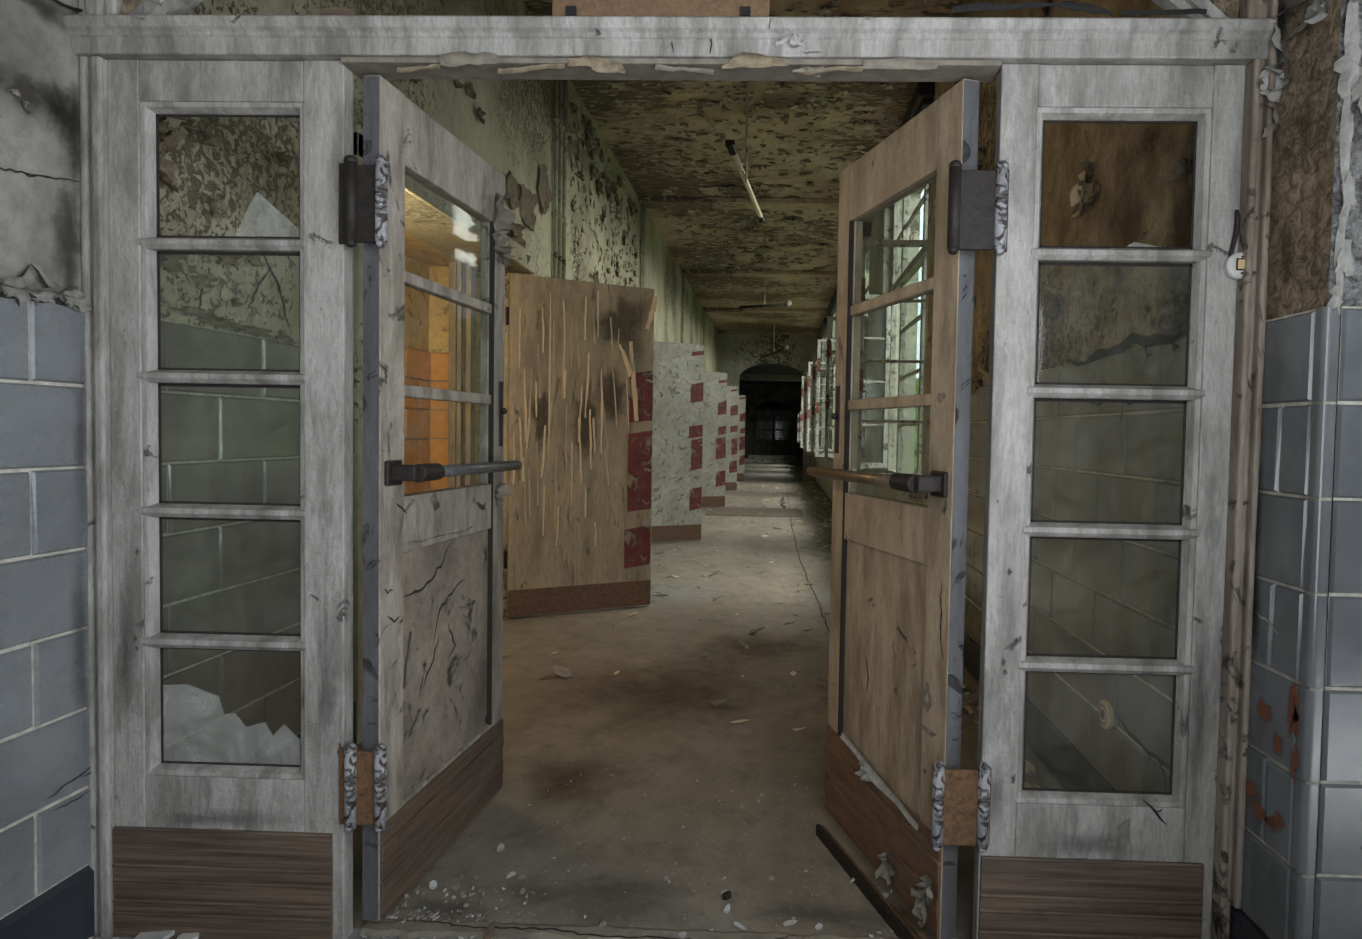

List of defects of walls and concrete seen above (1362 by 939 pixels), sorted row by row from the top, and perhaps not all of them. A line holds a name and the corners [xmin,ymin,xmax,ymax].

peeling [769,0,941,17]
peeling [1032,0,1049,17]
crack [0,167,79,182]
peeling [396,33,938,292]
flaking render [1327,0,1361,315]
peeling [0,260,92,312]
crack [779,472,830,633]
crack [364,920,691,939]